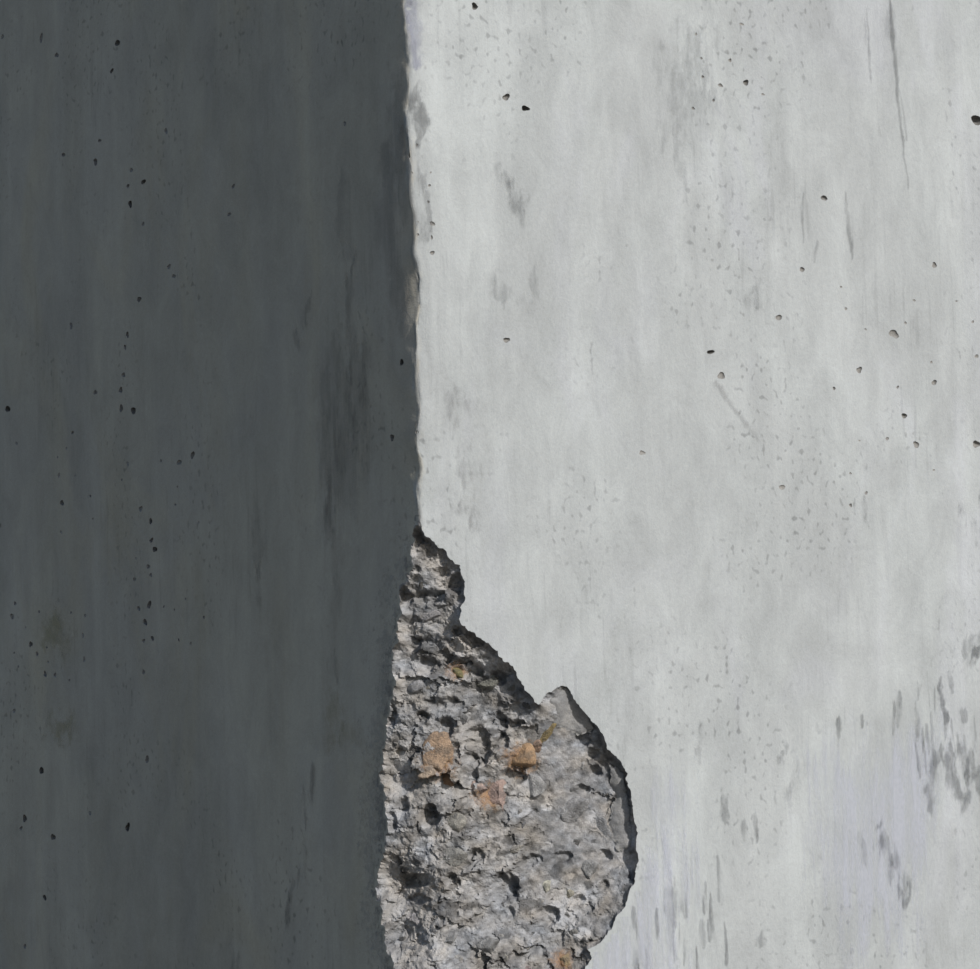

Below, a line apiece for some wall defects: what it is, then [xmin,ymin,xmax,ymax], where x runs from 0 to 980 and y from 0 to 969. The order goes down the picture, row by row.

spalling [372,517,639,969]